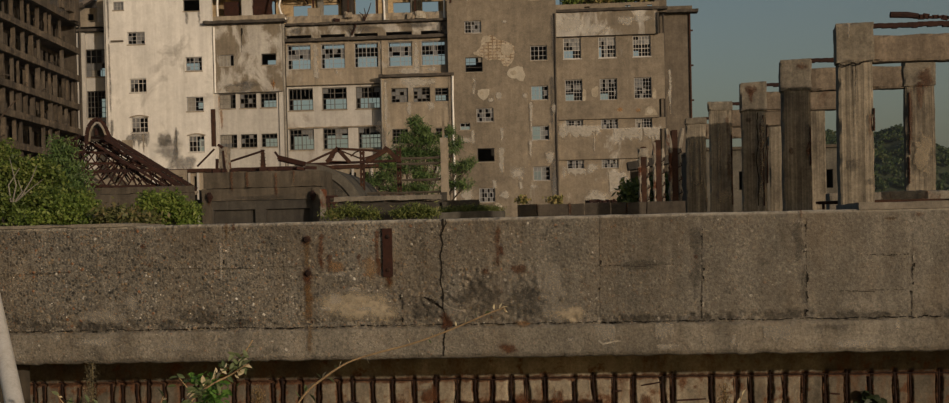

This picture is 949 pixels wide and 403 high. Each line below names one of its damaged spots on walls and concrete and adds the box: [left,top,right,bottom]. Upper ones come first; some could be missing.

spalling [473,35,525,81]
water stain [126,130,196,169]
crack [9,219,941,356]
corrosion [543,378,576,403]
corrosion [632,371,674,403]